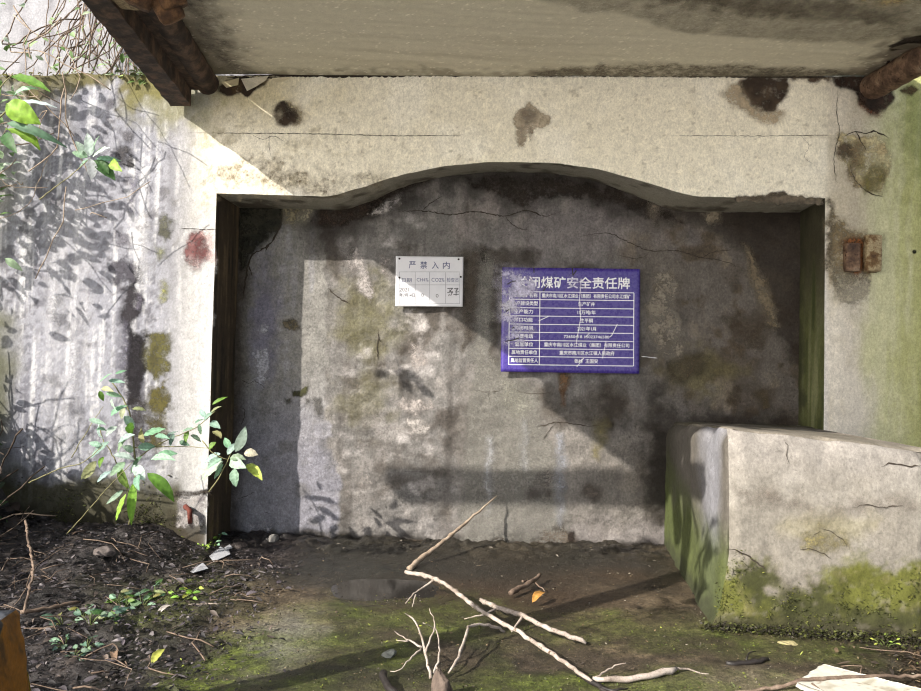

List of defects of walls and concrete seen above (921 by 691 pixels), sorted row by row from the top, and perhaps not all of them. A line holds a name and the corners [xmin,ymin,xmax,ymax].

crack [227,72,476,80]
spalling [274,101,302,126]
spalling [725,77,789,123]
crack [498,76,887,197]
crack [398,196,561,230]
damp [114,231,130,245]
rust [184,231,214,268]
rust [825,199,870,304]
damp [108,257,171,462]